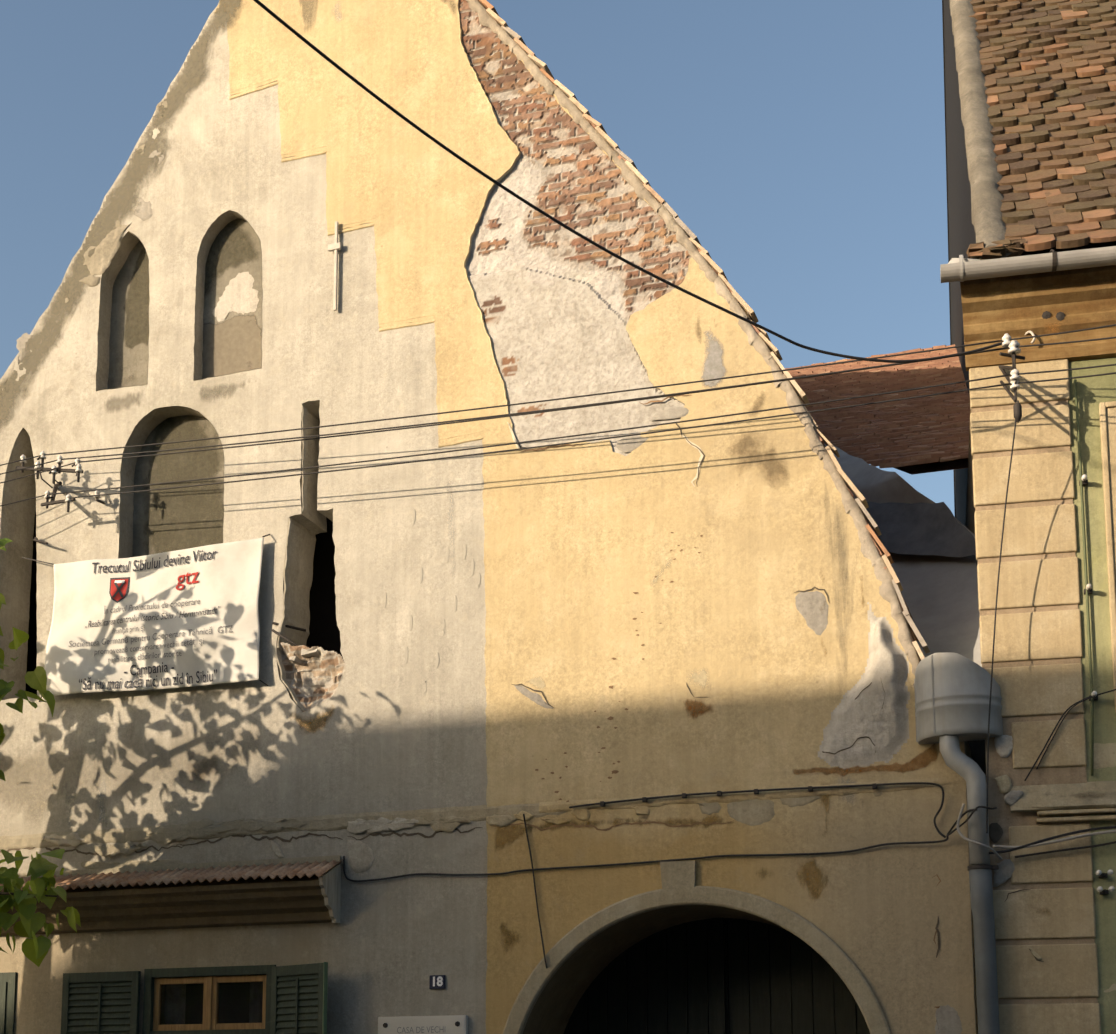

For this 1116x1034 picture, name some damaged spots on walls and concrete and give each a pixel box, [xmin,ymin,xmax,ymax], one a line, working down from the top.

flaking render [79,224,130,287]
peeling [202,221,262,379]
flaking render [458,0,692,456]
crack [675,423,705,487]
peeling [794,586,830,636]
flaking render [276,641,346,731]
flaking render [512,678,554,709]
peeling [0,752,734,873]